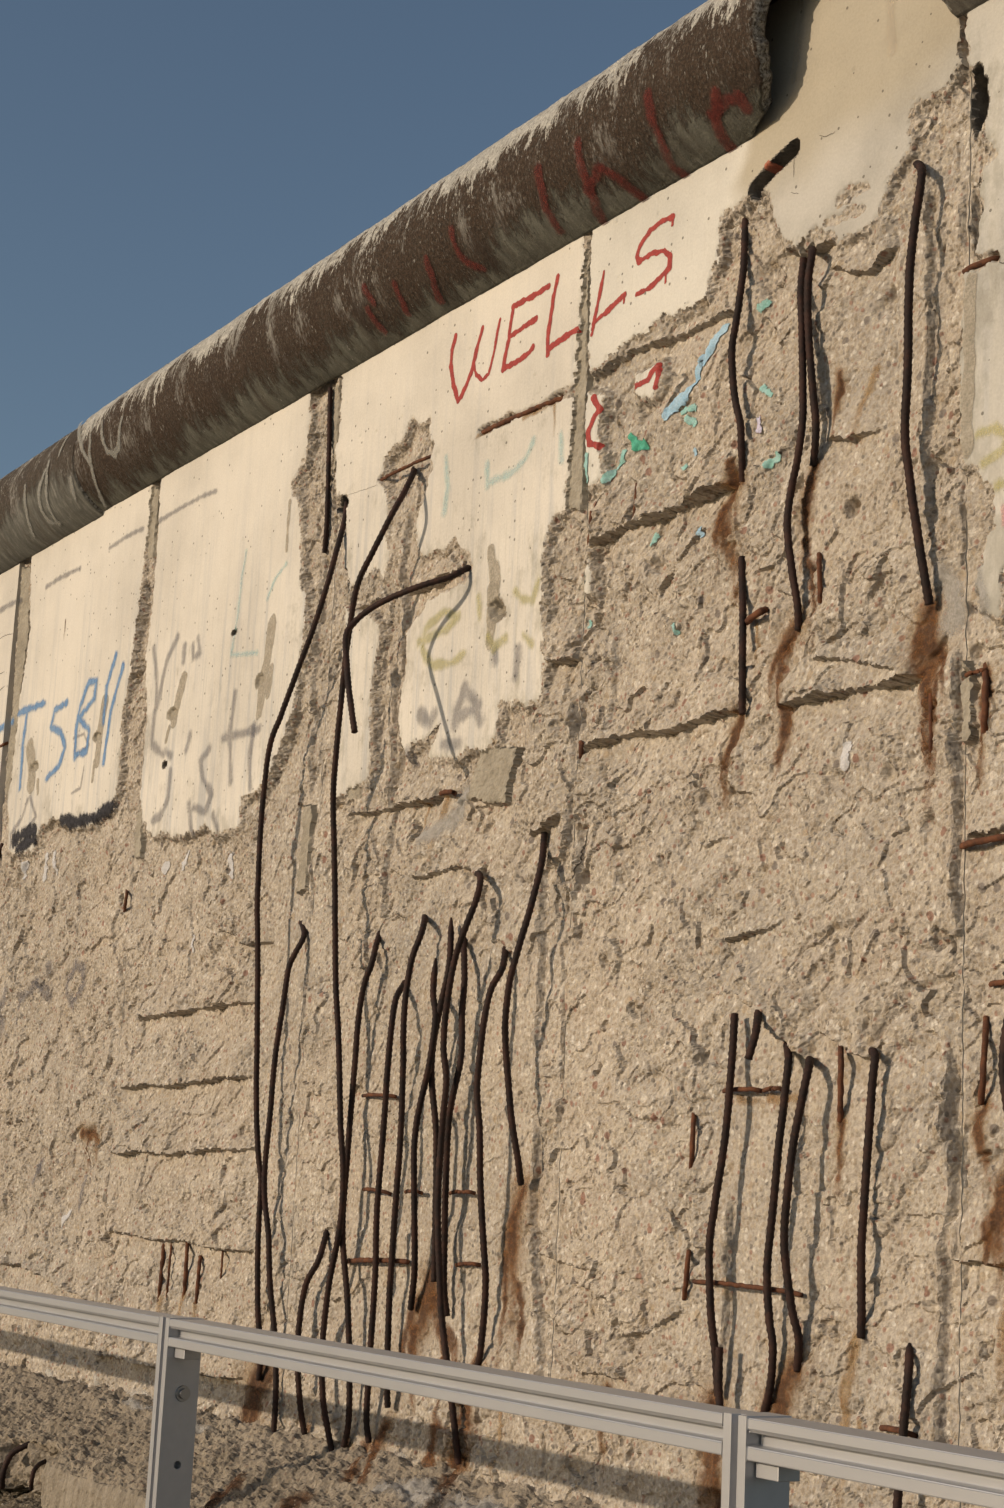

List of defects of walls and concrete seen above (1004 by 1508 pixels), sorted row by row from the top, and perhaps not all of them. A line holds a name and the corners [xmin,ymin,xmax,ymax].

corrosion [713,458,740,565]
corrosion [801,463,819,605]
spalling [336,14,1004,1453]
corrosion [721,711,745,791]
corrosion [768,623,799,773]
corrosion [910,600,947,774]
spalling [0,375,354,1343]
corrosion [500,1185,527,1344]
corrosion [981,1177,1004,1268]
spalling [0,1313,157,1399]
spalling [197,1353,722,1508]
spalling [789,1471,987,1508]